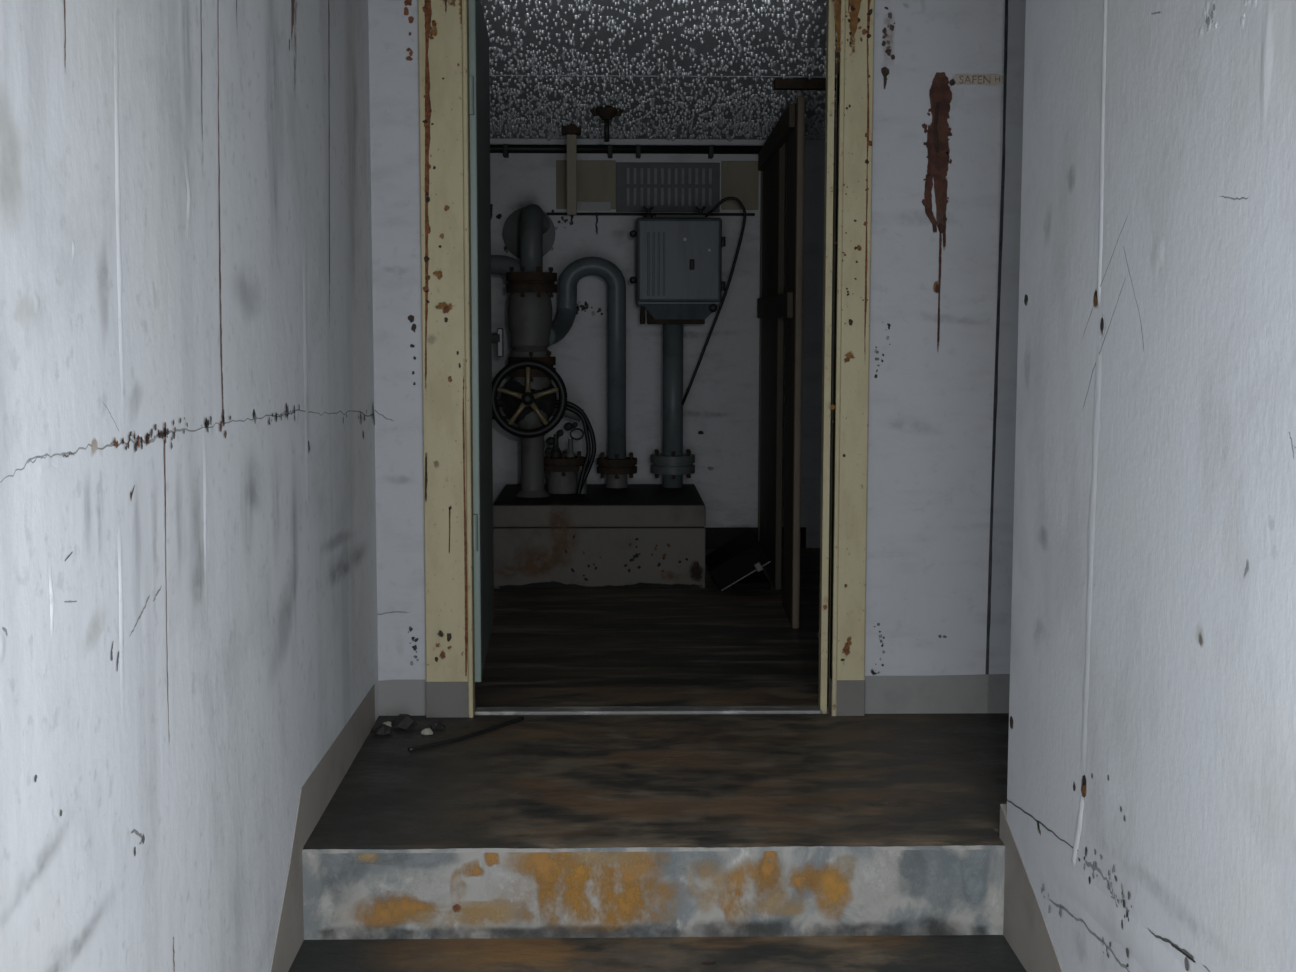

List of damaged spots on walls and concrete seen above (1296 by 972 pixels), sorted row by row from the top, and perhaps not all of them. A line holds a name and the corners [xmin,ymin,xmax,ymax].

rust [404,0,462,387]
rust [832,0,895,362]
rust [922,72,955,350]
crack [1,403,393,482]
rust [435,351,468,676]
rust [356,896,434,926]
rust [465,852,672,921]
rust [703,851,849,917]
crack [1007,800,1210,972]